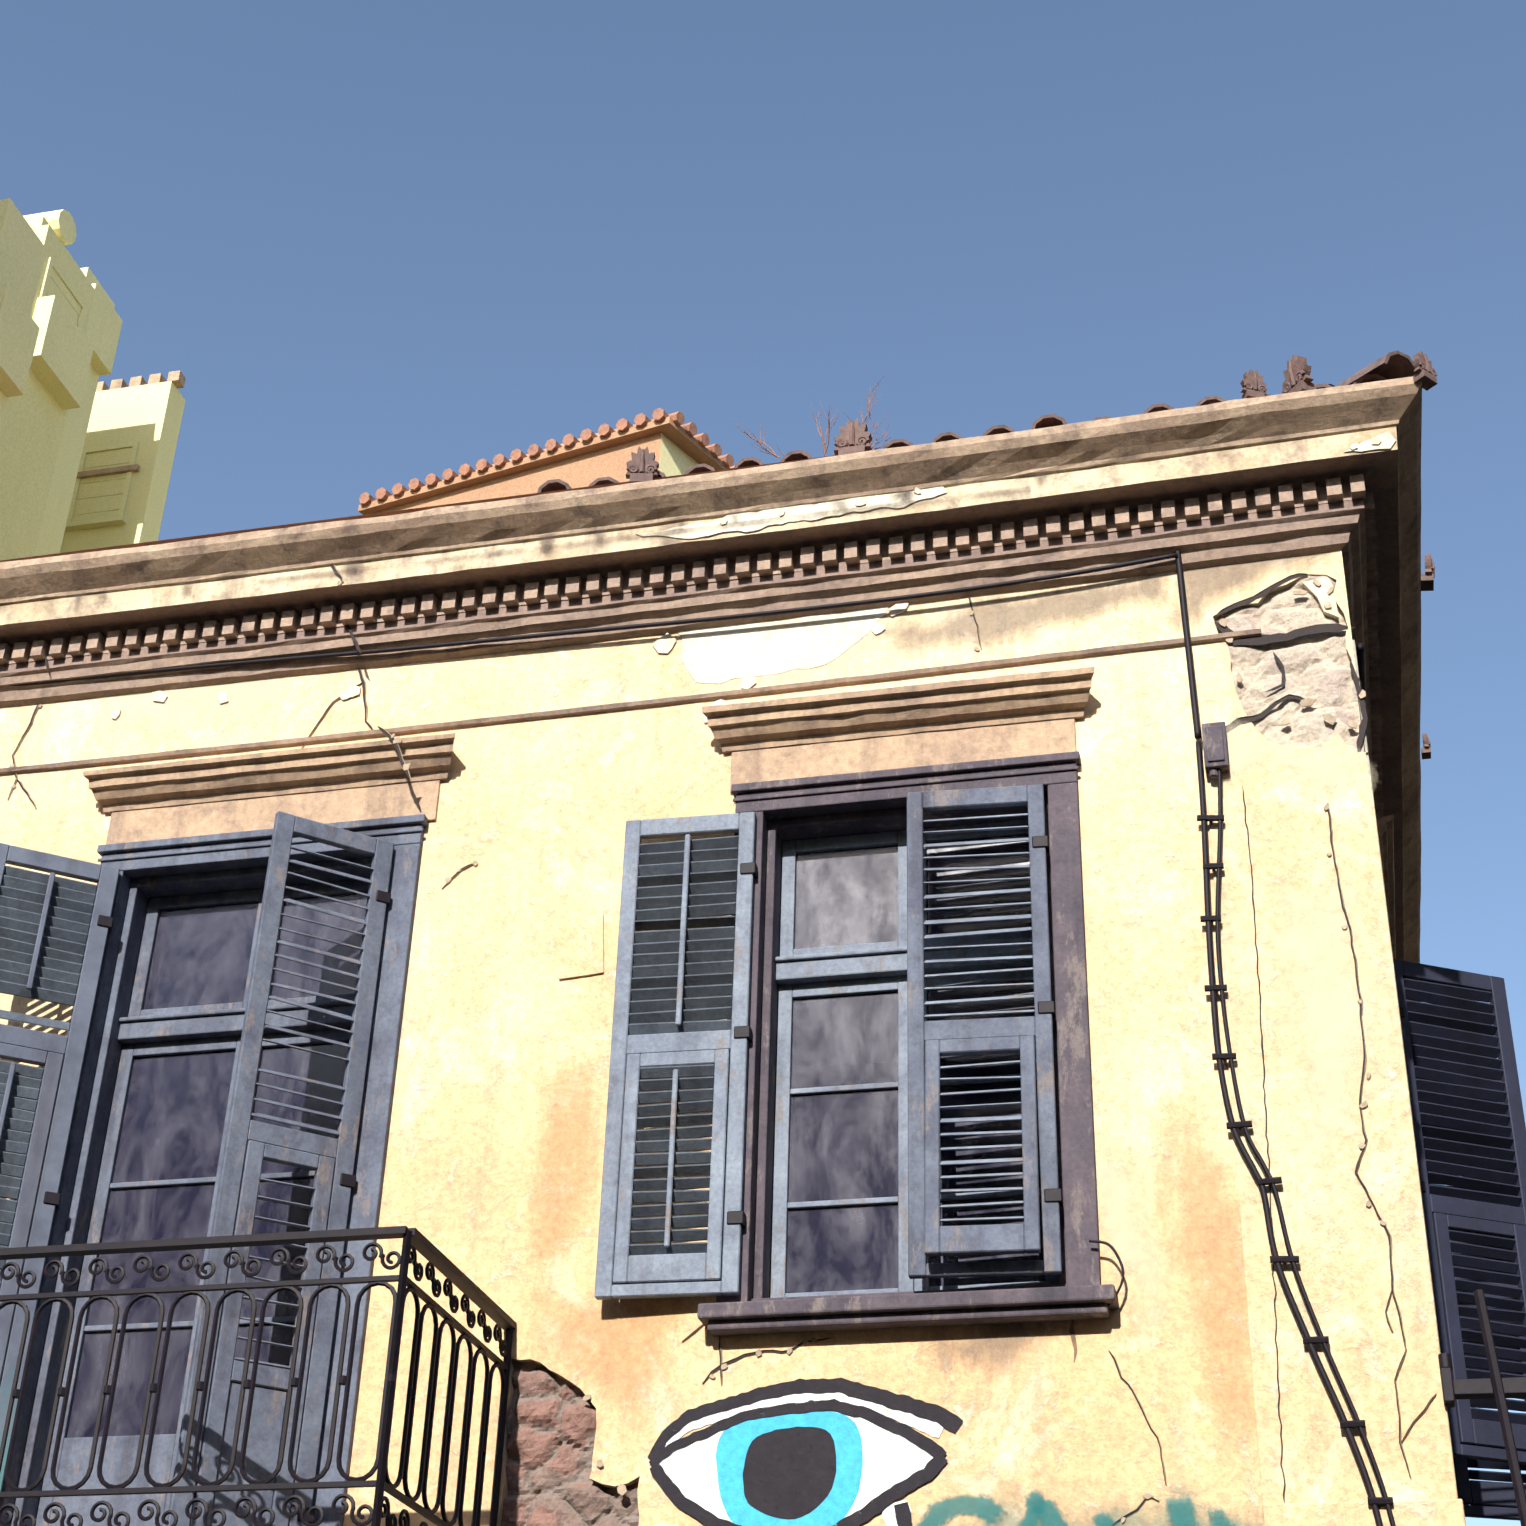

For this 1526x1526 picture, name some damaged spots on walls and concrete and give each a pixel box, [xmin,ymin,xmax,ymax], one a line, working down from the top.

crack [330,565,344,586]
crack [301,625,411,779]
peeling [652,602,909,723]
flaking render [1214,573,1368,778]
crack [1242,785,1273,1226]
crack [1323,803,1437,1477]
flaking render [501,1360,639,1526]
crack [682,1324,836,1386]
crack [1108,1350,1167,1526]
crack [1272,1263,1286,1503]